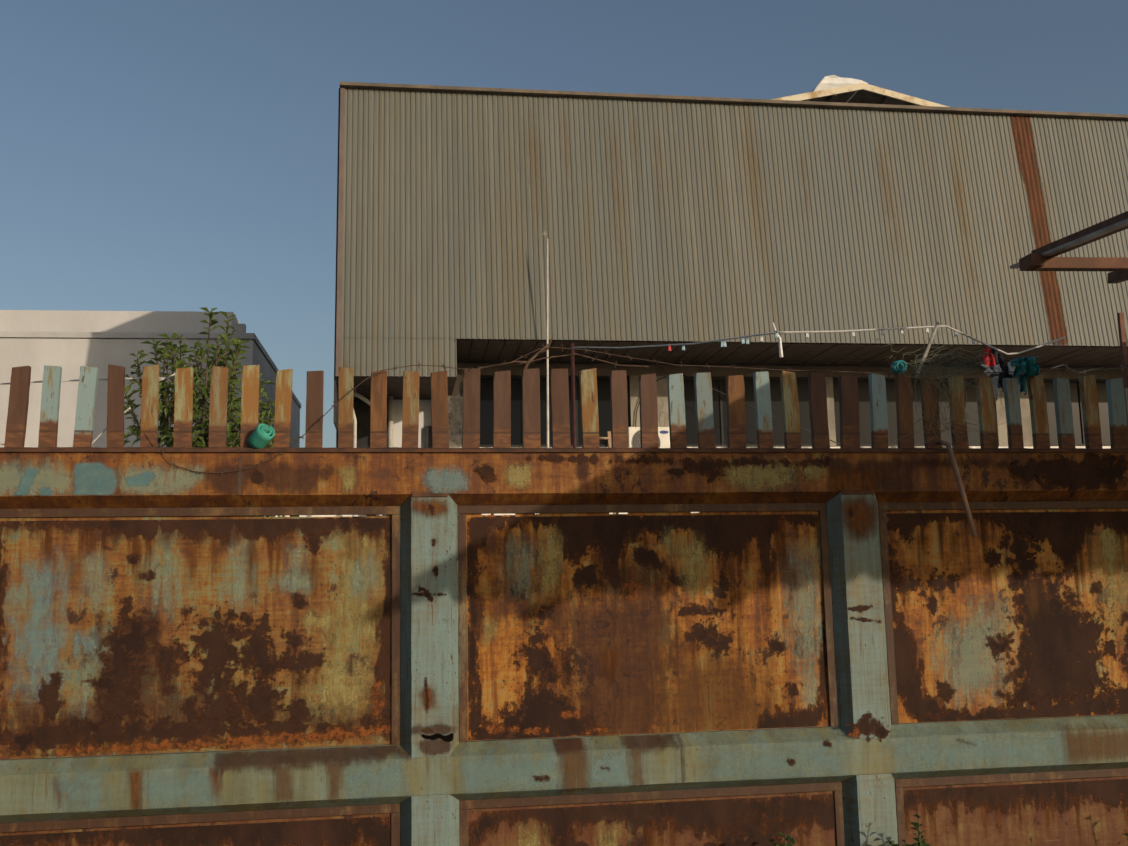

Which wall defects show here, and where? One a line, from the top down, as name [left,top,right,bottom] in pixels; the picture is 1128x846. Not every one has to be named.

corrosion [1010,115,1050,249]
corrosion [1039,271,1067,345]
corrosion [207,463,333,494]
corrosion [475,463,498,482]
corrosion [527,453,1128,729]
corrosion [0,518,408,801]
corrosion [467,514,821,789]
corrosion [846,711,891,742]
corrosion [131,772,141,809]
corrosion [0,817,390,846]
corrosion [469,794,835,846]
corrosion [904,779,1128,841]